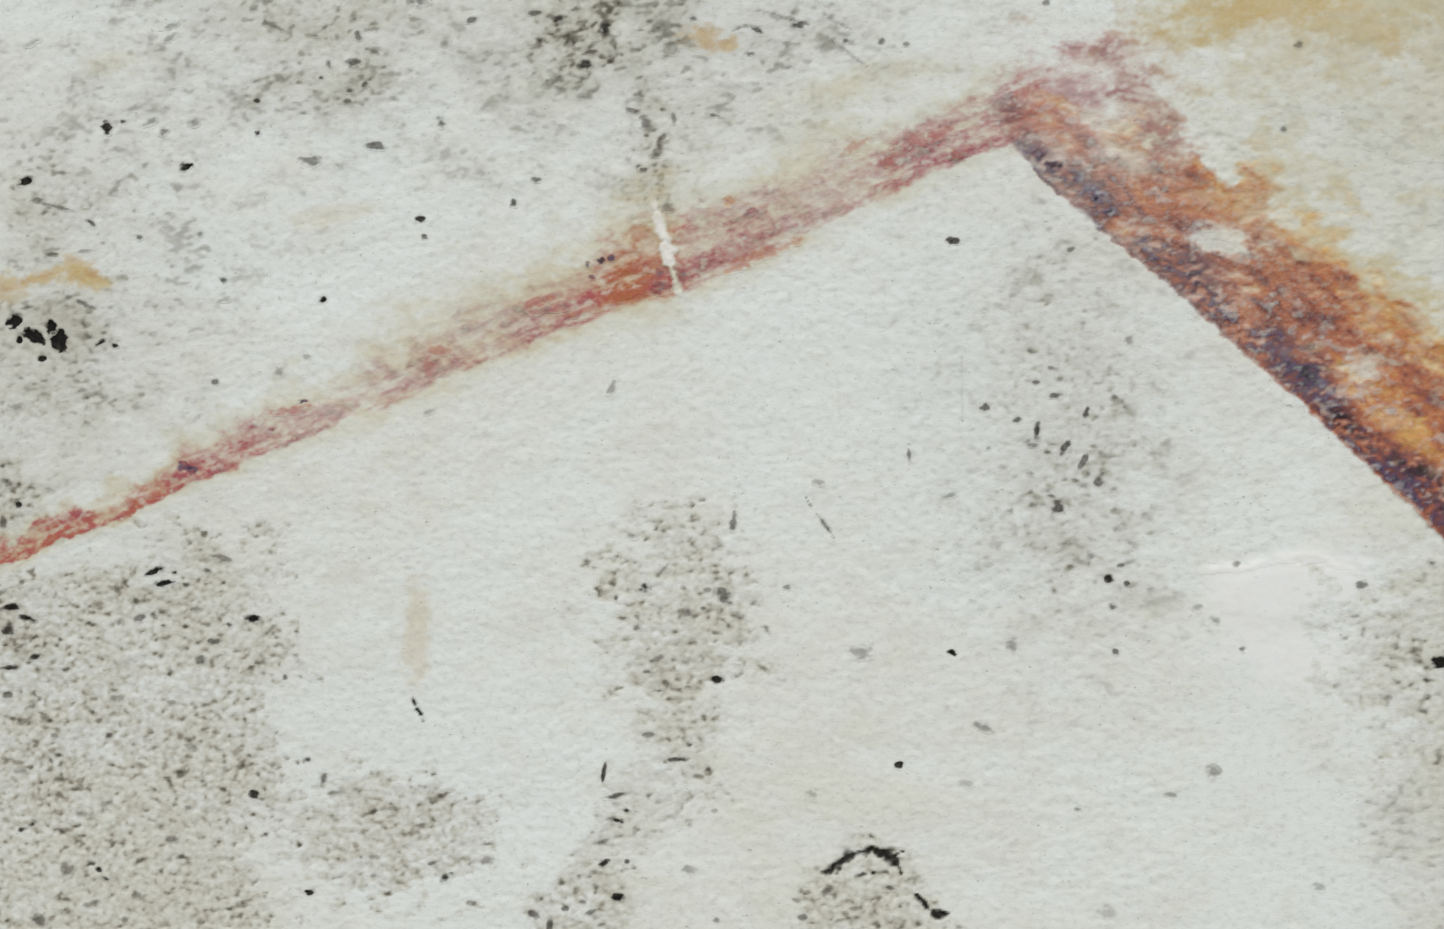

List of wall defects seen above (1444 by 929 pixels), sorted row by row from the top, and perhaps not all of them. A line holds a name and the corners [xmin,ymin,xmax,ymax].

water stain [656,199,676,213]
water stain [500,0,911,185]
corrosion [0,7,1444,579]
water stain [989,0,1444,207]
water stain [0,463,806,929]
corrosion [391,509,439,730]
water stain [784,825,970,929]